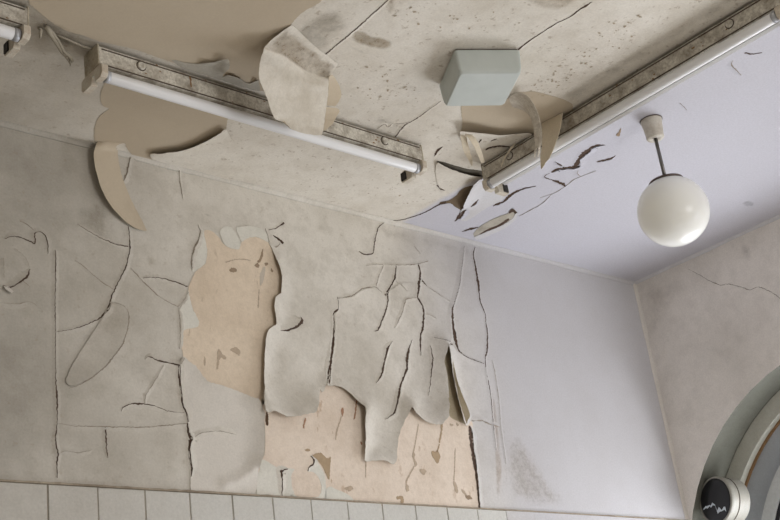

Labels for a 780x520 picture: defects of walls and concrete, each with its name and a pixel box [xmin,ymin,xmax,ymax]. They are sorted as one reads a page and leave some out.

peeling [29,0,341,135]
crack [326,0,390,56]
peeling [94,83,228,231]
peeling [473,209,517,240]
peeling [435,91,573,221]
crack [0,220,236,478]
flaking render [179,226,491,509]
crack [324,142,616,510]